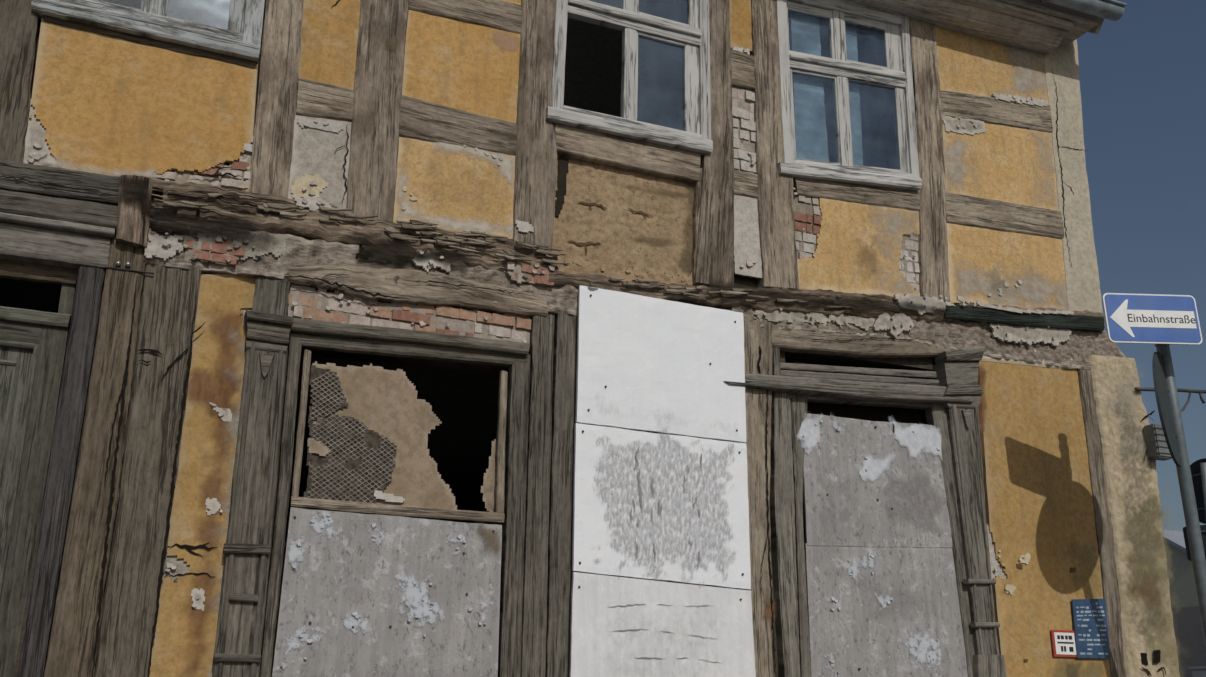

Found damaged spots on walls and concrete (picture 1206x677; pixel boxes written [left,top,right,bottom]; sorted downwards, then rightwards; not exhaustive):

flaking render [23,101,69,168]
flaking render [111,135,286,267]
flaking render [732,86,756,174]
flaking render [793,187,822,259]
crack [1052,71,1088,266]
flaking render [287,285,531,343]
spalling [753,233,1074,347]
crack [164,542,218,578]